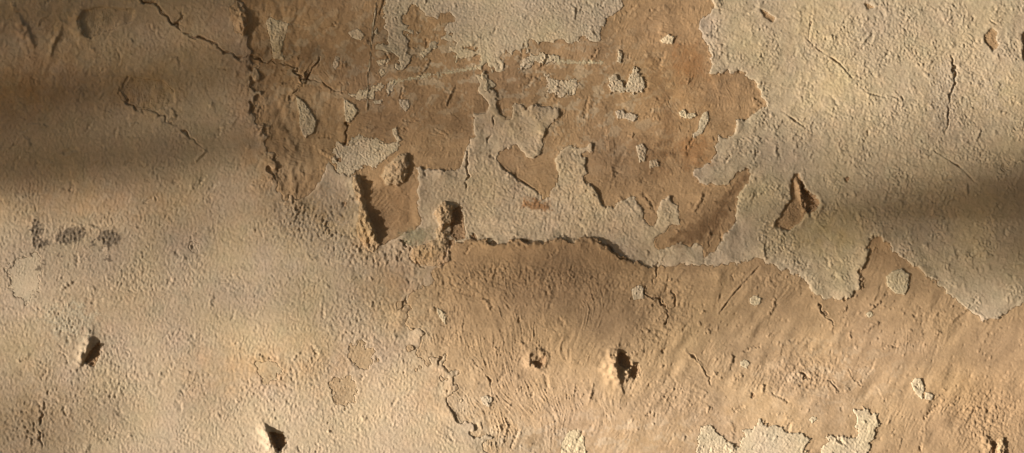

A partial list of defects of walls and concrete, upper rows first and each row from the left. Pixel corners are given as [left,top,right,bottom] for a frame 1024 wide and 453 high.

crack [141,0,384,106]
crack [945,59,956,132]
spalling [238,0,1024,453]